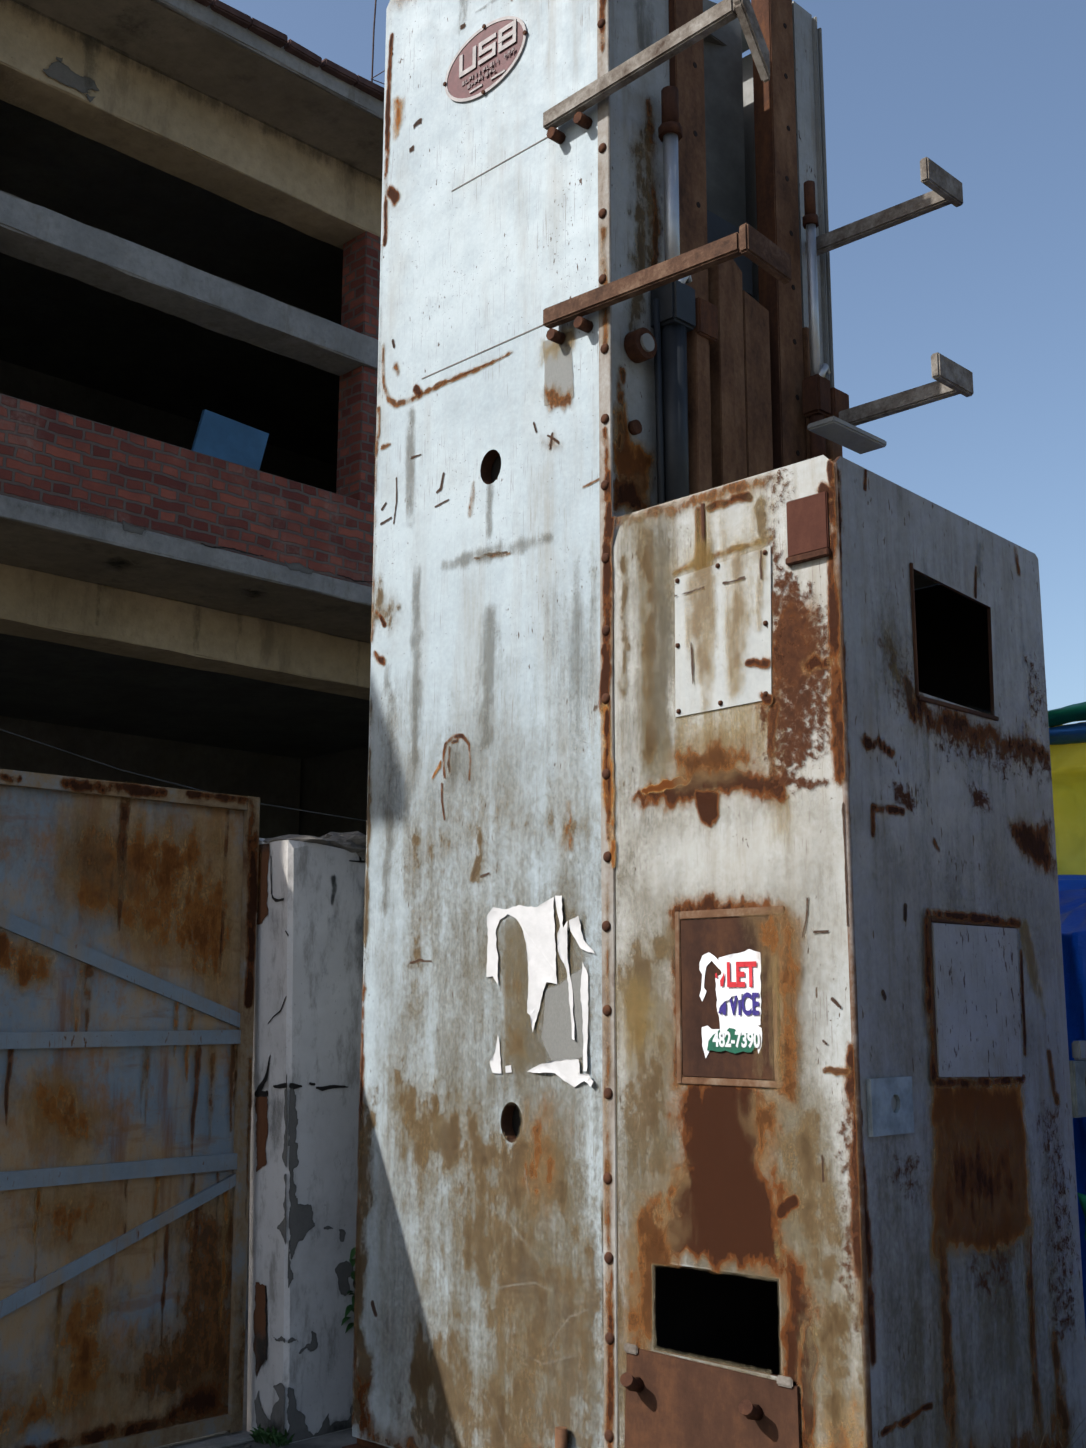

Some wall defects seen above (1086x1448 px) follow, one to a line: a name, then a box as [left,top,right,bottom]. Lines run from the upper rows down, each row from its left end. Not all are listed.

corrosion [383,33,402,246]
corrosion [376,339,512,457]
corrosion [54,778,258,1009]
corrosion [404,733,489,883]
corrosion [598,367,895,868]
corrosion [873,626,1052,816]
corrosion [0,1173,246,1448]
spalling [255,1055,346,1288]
spalling [253,1282,353,1443]
spalling [335,1261,355,1296]
corrosion [352,892,876,1448]
corrosion [924,908,1070,1448]